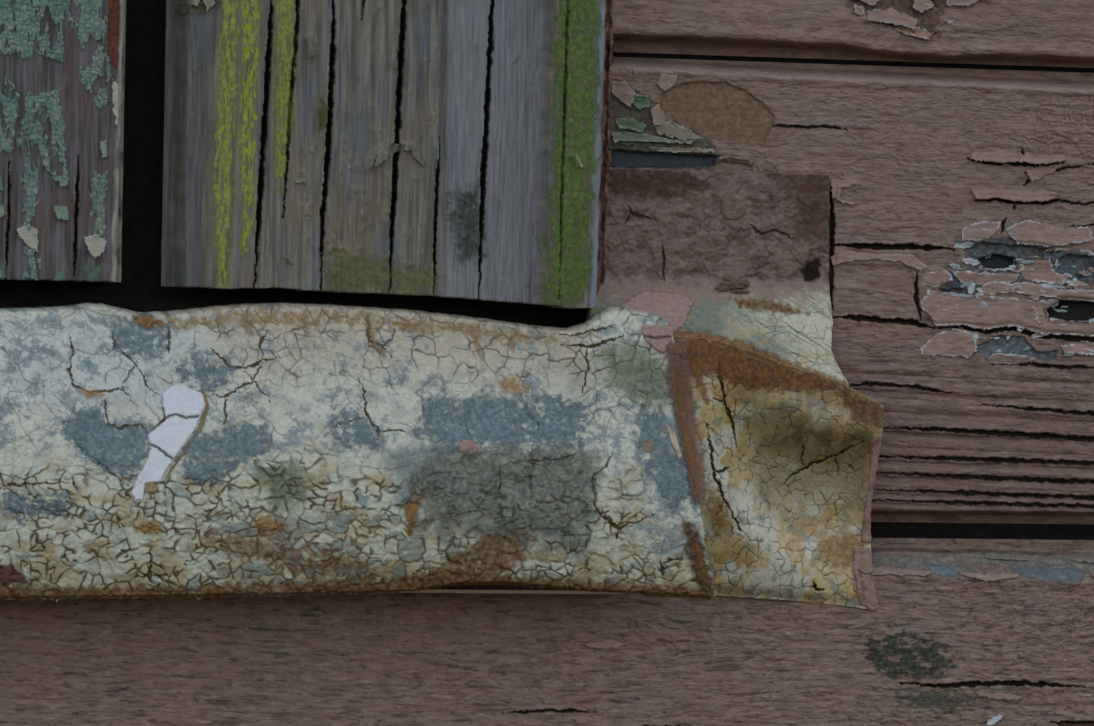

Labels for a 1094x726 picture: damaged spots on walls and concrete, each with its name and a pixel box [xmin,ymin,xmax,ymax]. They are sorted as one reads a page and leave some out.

peeling [849,0,979,40]
peeling [0,0,123,281]
crack [319,0,365,290]
crack [389,0,406,286]
peeling [608,73,777,171]
peeling [970,151,1065,203]
crack [67,326,159,430]
crack [207,330,281,424]
corrosion [133,306,556,355]
crack [706,376,749,538]
corrosion [666,331,884,536]
peeling [800,220,1094,365]